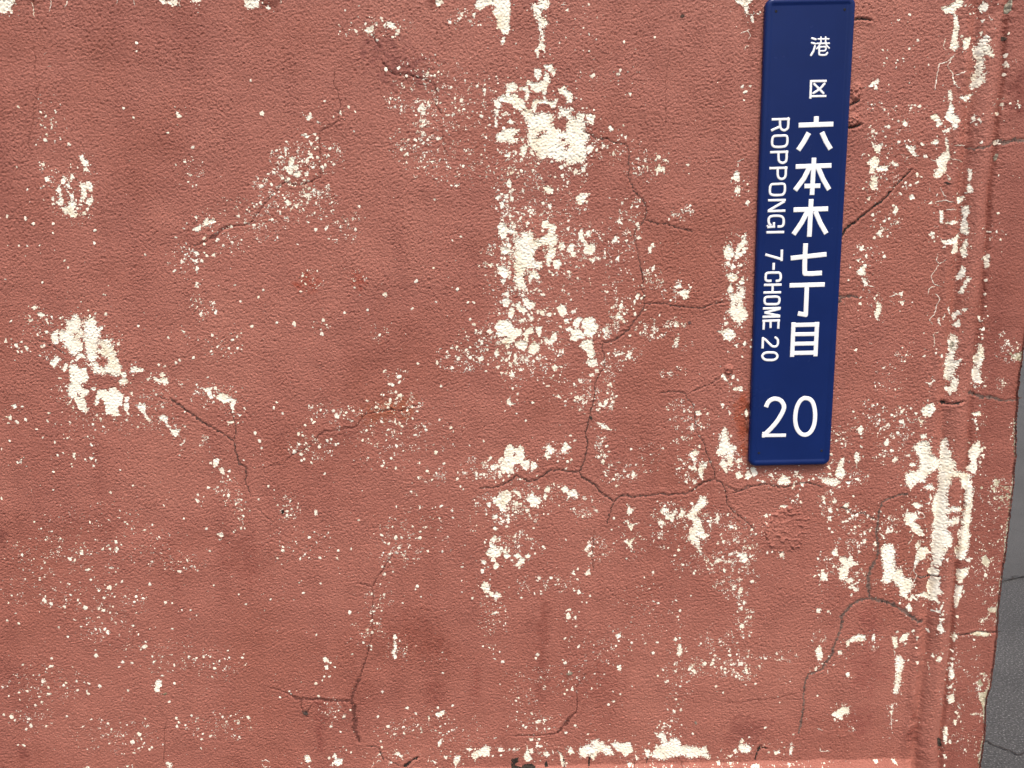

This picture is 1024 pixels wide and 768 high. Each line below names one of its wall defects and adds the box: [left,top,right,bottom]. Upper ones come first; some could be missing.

peeling [0,0,19,17]
peeling [26,153,99,245]
peeling [165,100,363,322]
peeling [0,301,246,467]
peeling [195,435,260,540]
crack [157,396,418,518]
crack [479,132,823,570]
peeling [288,0,1022,768]
peeling [1,657,102,731]
peeling [1,491,247,703]
crack [273,556,418,768]
crack [727,493,923,734]